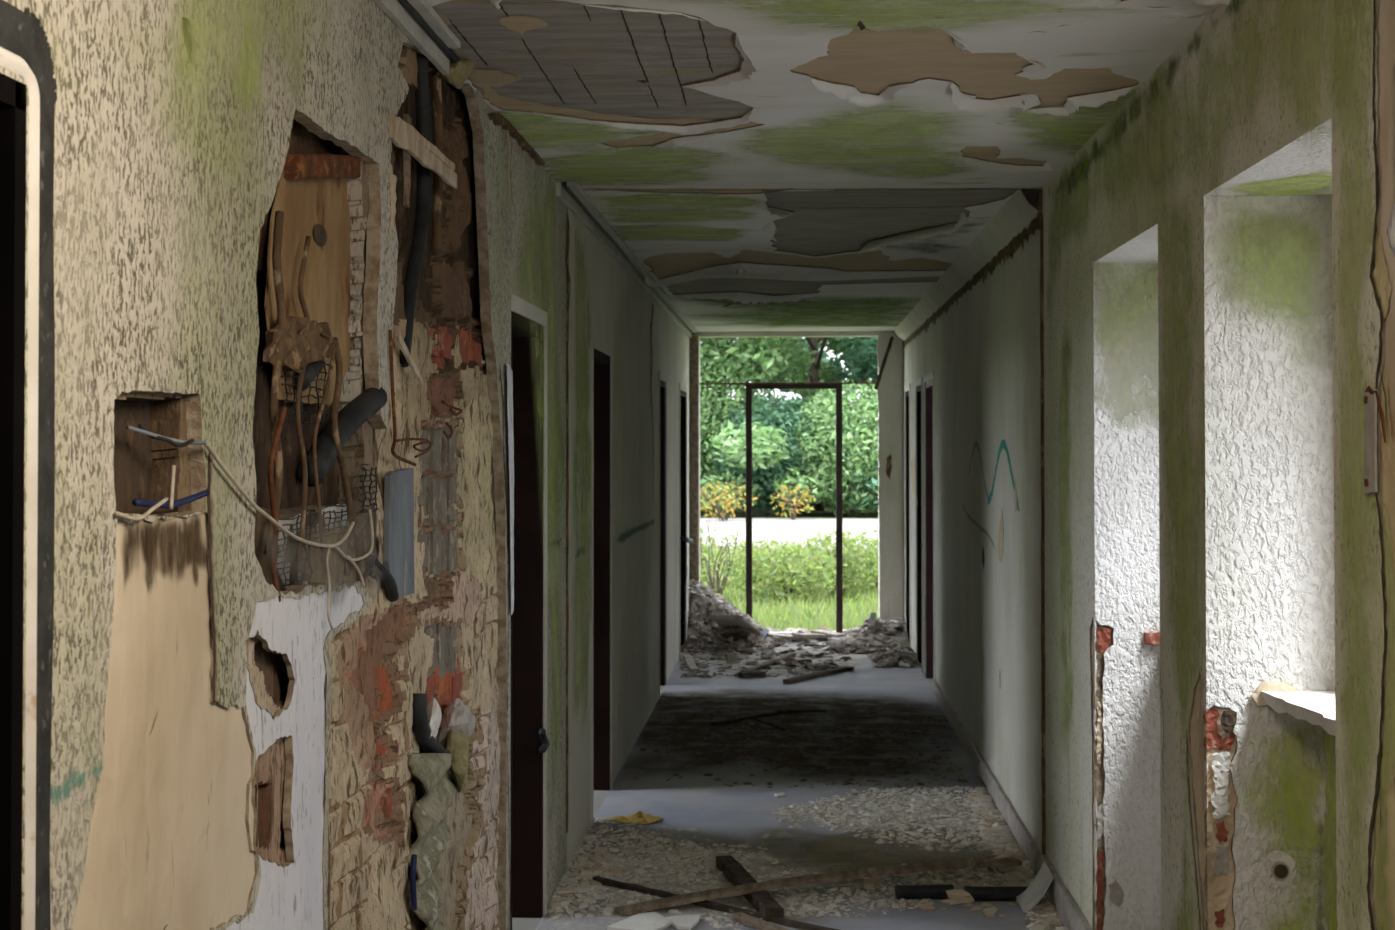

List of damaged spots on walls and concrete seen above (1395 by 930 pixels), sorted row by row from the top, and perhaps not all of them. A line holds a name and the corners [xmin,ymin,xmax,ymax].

peeling [432,0,760,148]
peeling [791,26,1139,116]
peeling [601,146,1053,307]
crack [1369,0,1388,435]
leakage [124,520,208,589]
peeling [72,118,378,930]
spalling [1091,620,1124,930]
flaking render [1144,632,1162,716]
spalling [1190,678,1237,930]
crack [1366,492,1387,930]